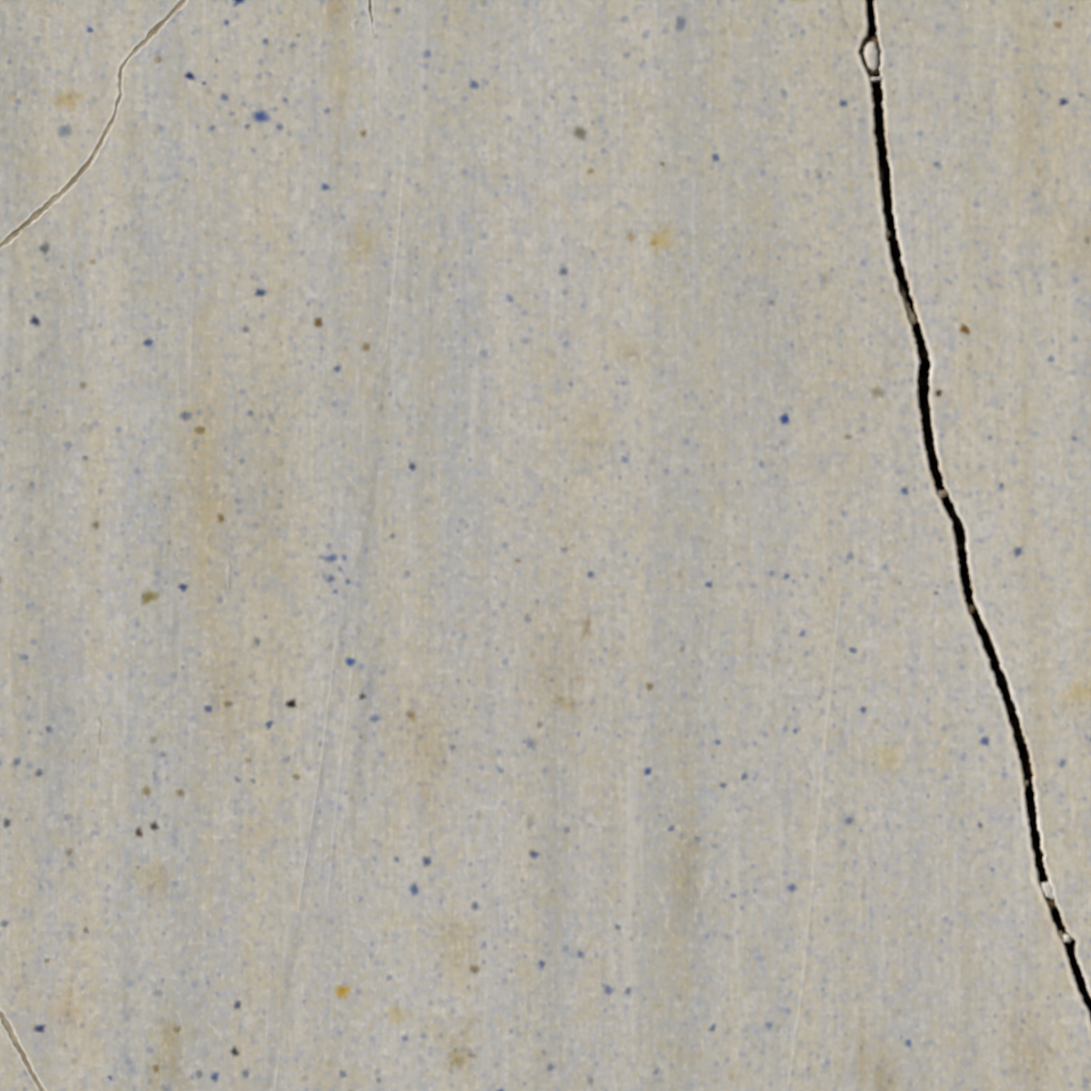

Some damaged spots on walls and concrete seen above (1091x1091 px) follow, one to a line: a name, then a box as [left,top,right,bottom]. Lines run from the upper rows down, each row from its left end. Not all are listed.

crack [0,0,190,251]
crack [854,0,1091,1056]
crack [0,1007,48,1091]